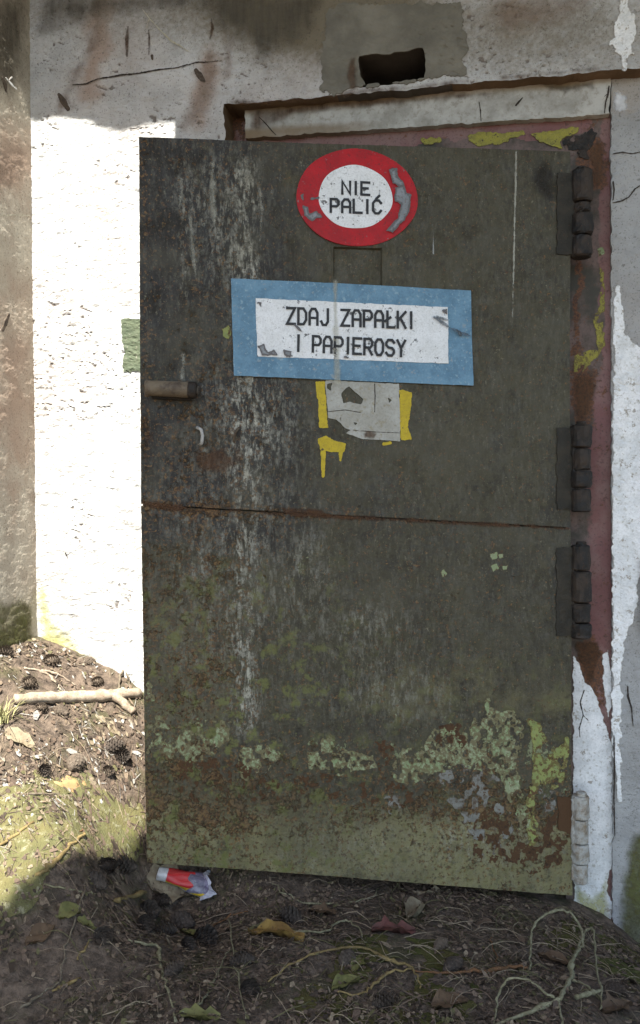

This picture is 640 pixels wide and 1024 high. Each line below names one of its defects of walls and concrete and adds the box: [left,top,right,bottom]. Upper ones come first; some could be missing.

crack [72,9,218,85]
peeling [467,126,597,160]
crack [613,181,640,203]
peeling [258,344,292,357]
rust [262,508,547,528]
peeling [383,247,640,919]
rust [575,642,600,681]
rust [435,723,467,748]
peeling [307,736,377,776]
rust [177,757,340,802]
rust [473,808,568,875]